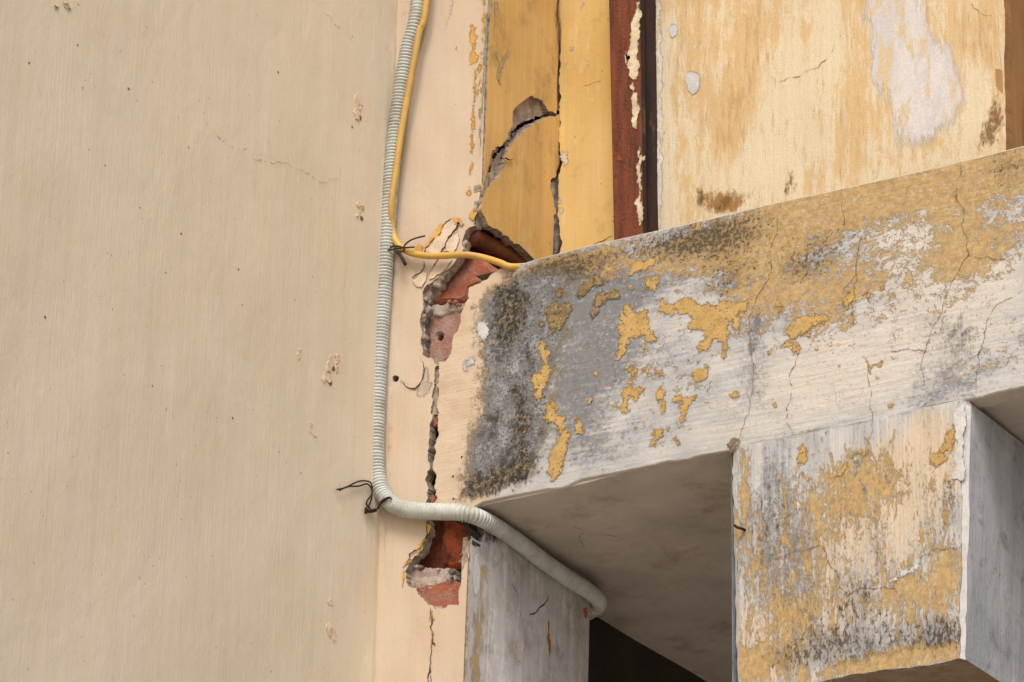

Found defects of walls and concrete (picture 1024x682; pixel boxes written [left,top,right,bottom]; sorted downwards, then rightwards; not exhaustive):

crack [500,114,547,160]
crack [550,144,562,255]
peeling [625,2,642,129]
peeling [634,0,665,229]
peeling [864,0,965,149]
leakage [981,102,1003,145]
crack [431,358,444,503]
leakage [459,265,574,499]
peeling [530,257,749,481]
crack [867,161,1008,436]
crack [963,291,1021,392]
flaking render [402,520,481,609]